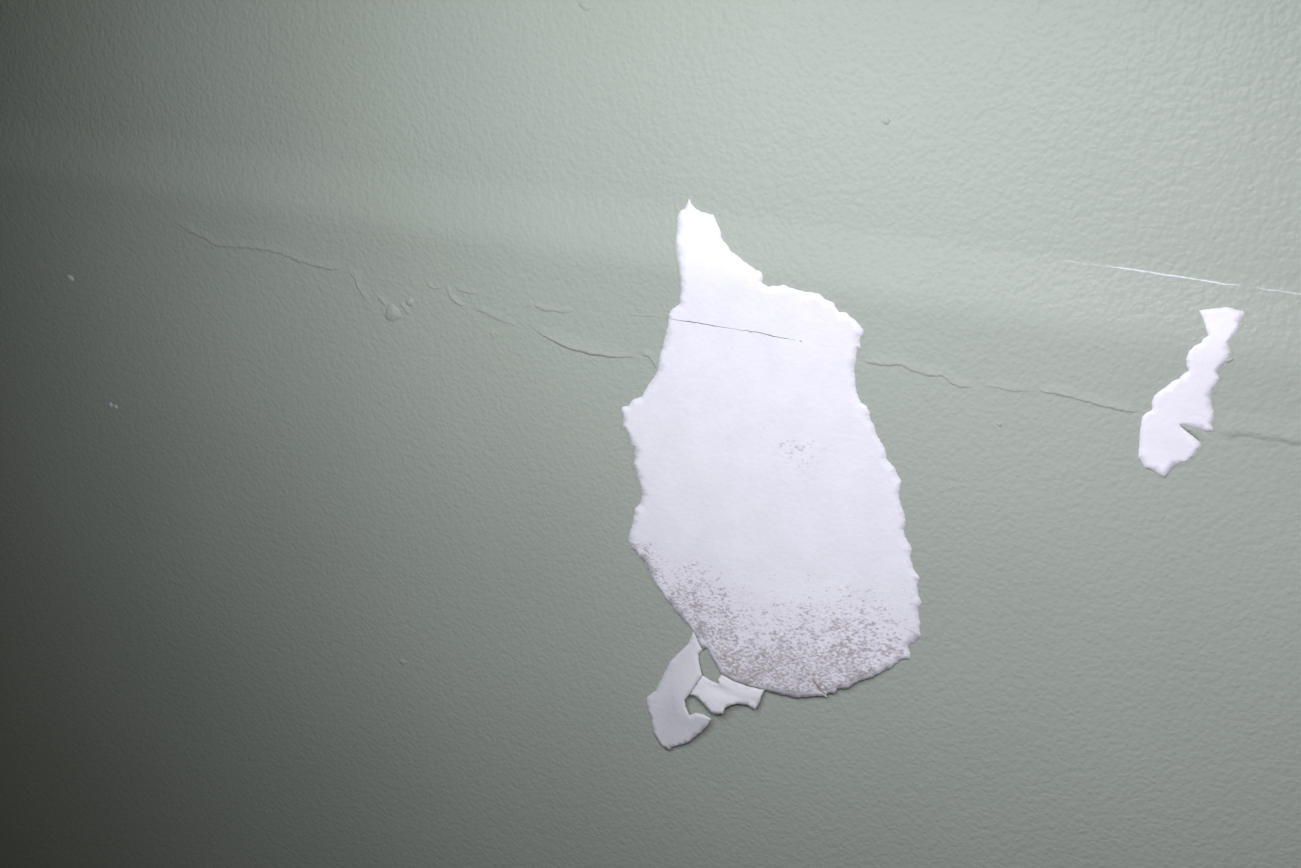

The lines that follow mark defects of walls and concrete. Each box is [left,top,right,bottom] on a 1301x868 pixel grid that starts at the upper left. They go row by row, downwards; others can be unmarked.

peeling [619,197,925,751]
crack [630,314,1138,413]
crack [1064,260,1301,295]
peeling [1136,304,1248,477]